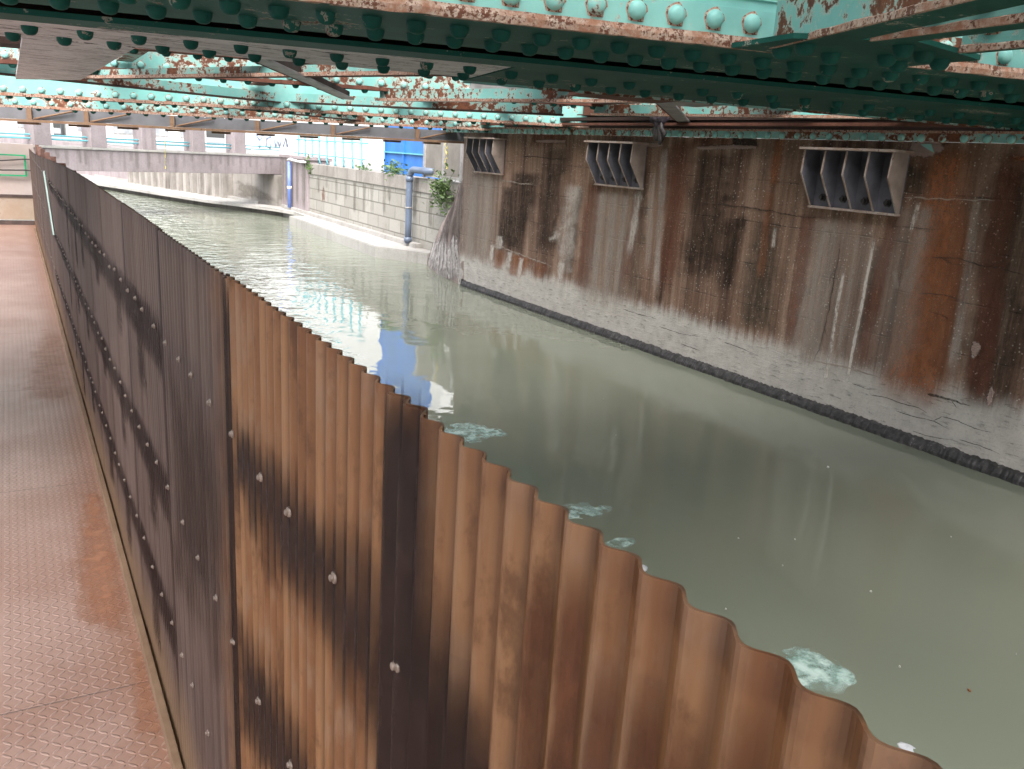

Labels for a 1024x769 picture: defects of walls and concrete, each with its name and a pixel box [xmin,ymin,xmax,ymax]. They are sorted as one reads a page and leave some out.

water stain [482,156,564,282]
water stain [824,276,844,378]
water stain [847,248,881,375]
crack [814,248,995,452]
rust [224,307,241,769]
water stain [237,440,379,726]
rust [376,430,426,769]